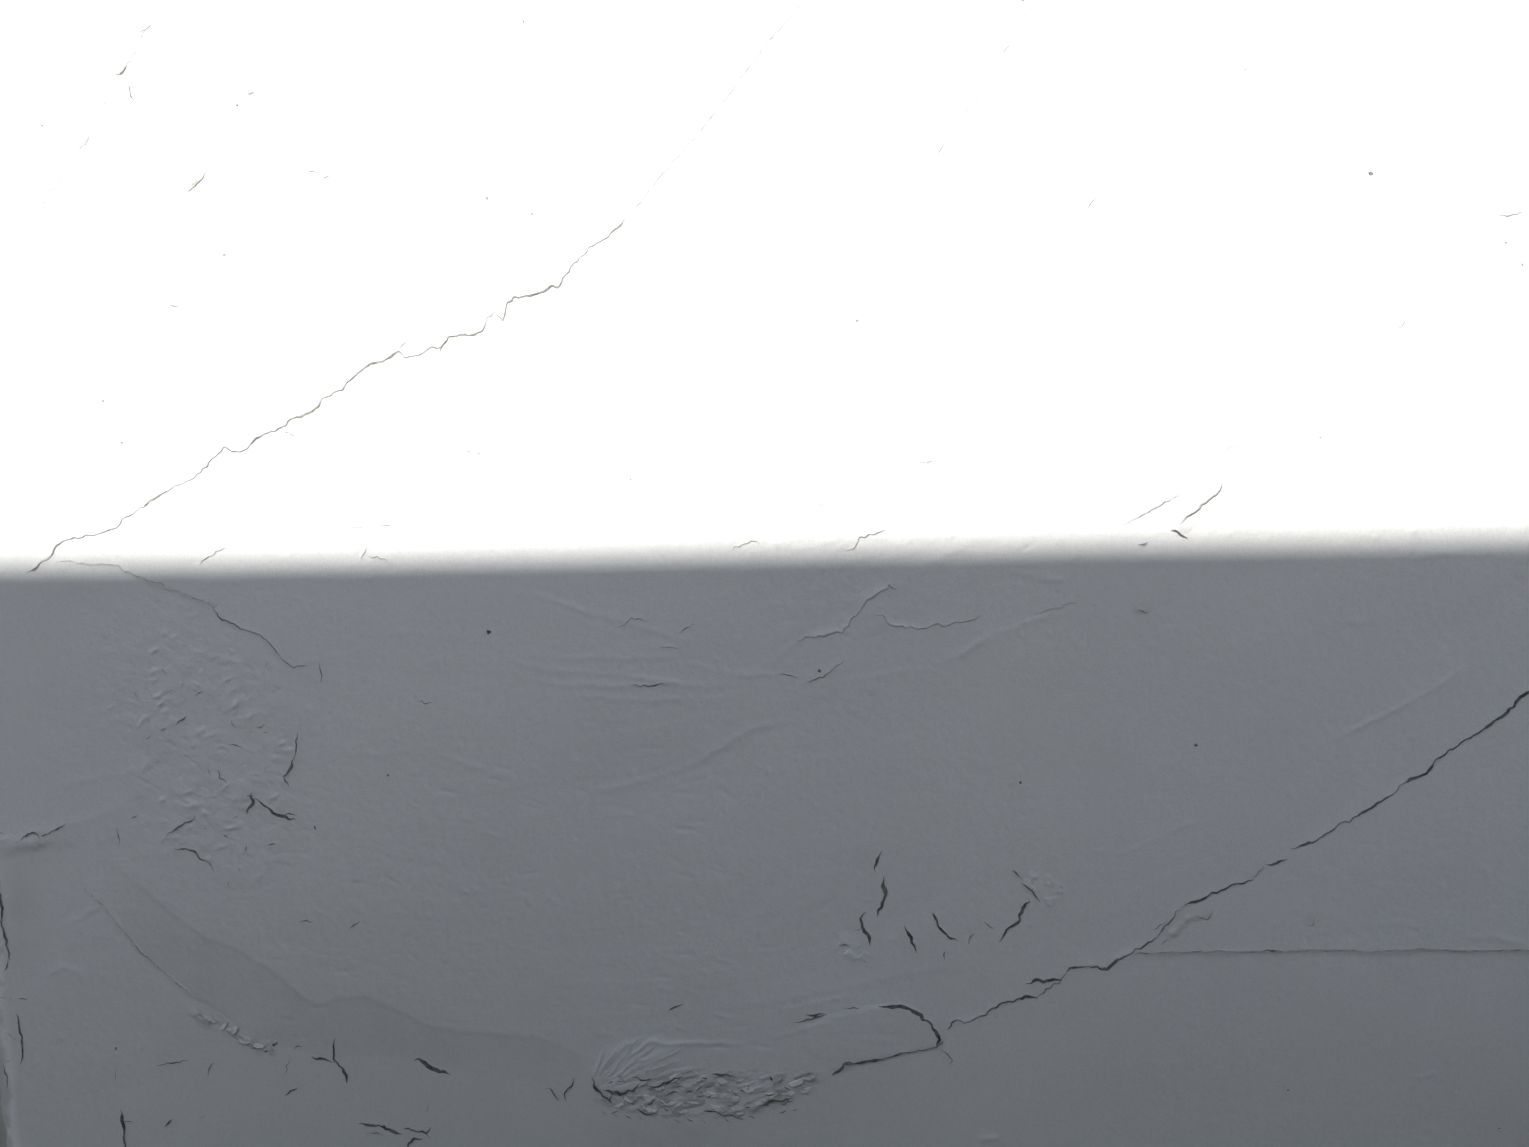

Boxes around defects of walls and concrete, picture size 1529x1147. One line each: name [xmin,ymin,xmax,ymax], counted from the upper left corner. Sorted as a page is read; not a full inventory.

crack [25,0,805,683]
crack [855,851,1029,960]
crack [945,682,1529,1030]
flaking render [0,979,15,1147]
peeling [592,1065,826,1122]